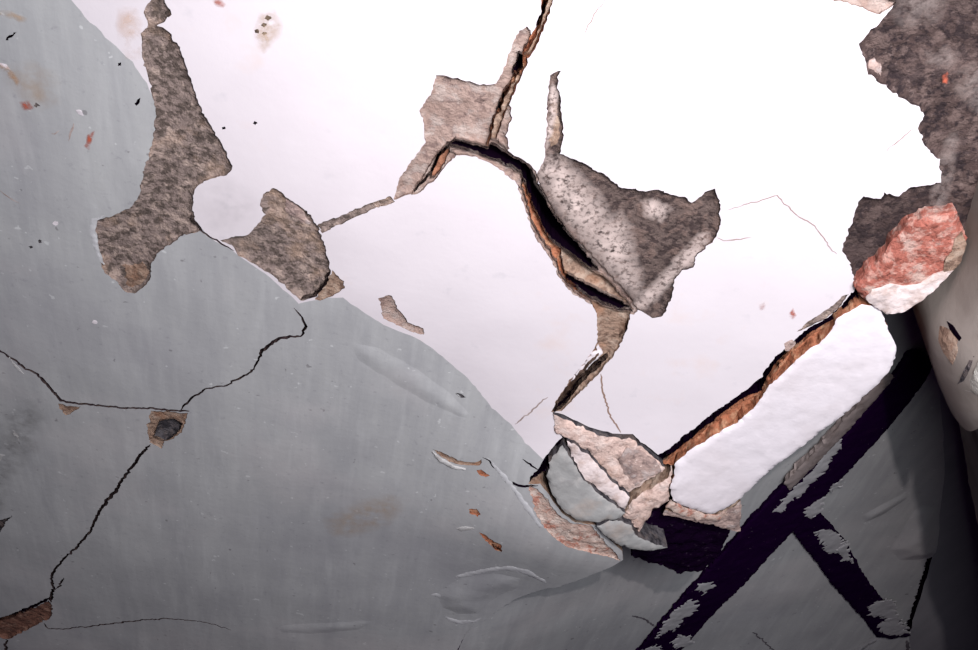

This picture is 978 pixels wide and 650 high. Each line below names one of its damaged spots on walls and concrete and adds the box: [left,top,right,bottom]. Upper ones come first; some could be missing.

flaking render [89,0,345,301]
flaking render [394,27,531,200]
crack [411,0,638,432]
flaking render [537,71,721,318]
flaking render [833,0,978,280]
crack [49,444,151,602]
crack [0,309,308,415]
flaking render [378,295,424,334]
crack [513,438,562,488]
crack [657,289,859,465]
peeling [773,439,842,513]
crack [44,618,228,630]